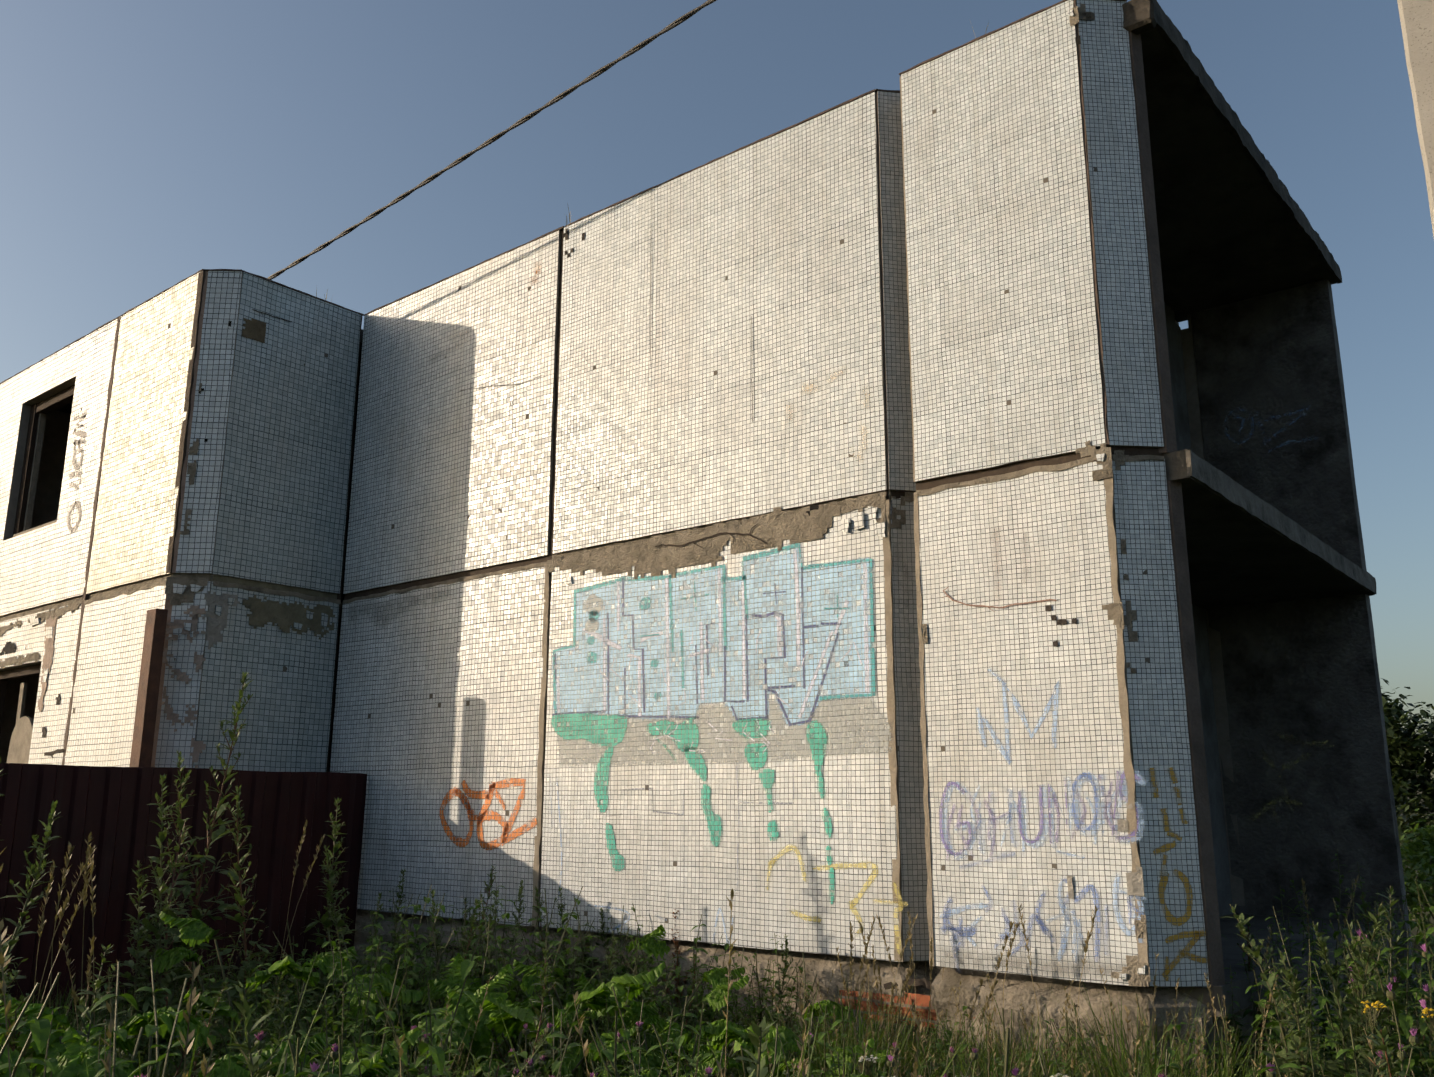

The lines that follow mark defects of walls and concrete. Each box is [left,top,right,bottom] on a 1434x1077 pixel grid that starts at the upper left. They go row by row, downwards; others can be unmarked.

spalling [228,318,266,343]
spalling [547,492,914,584]
spalling [0,598,84,737]
peeling [162,576,335,768]